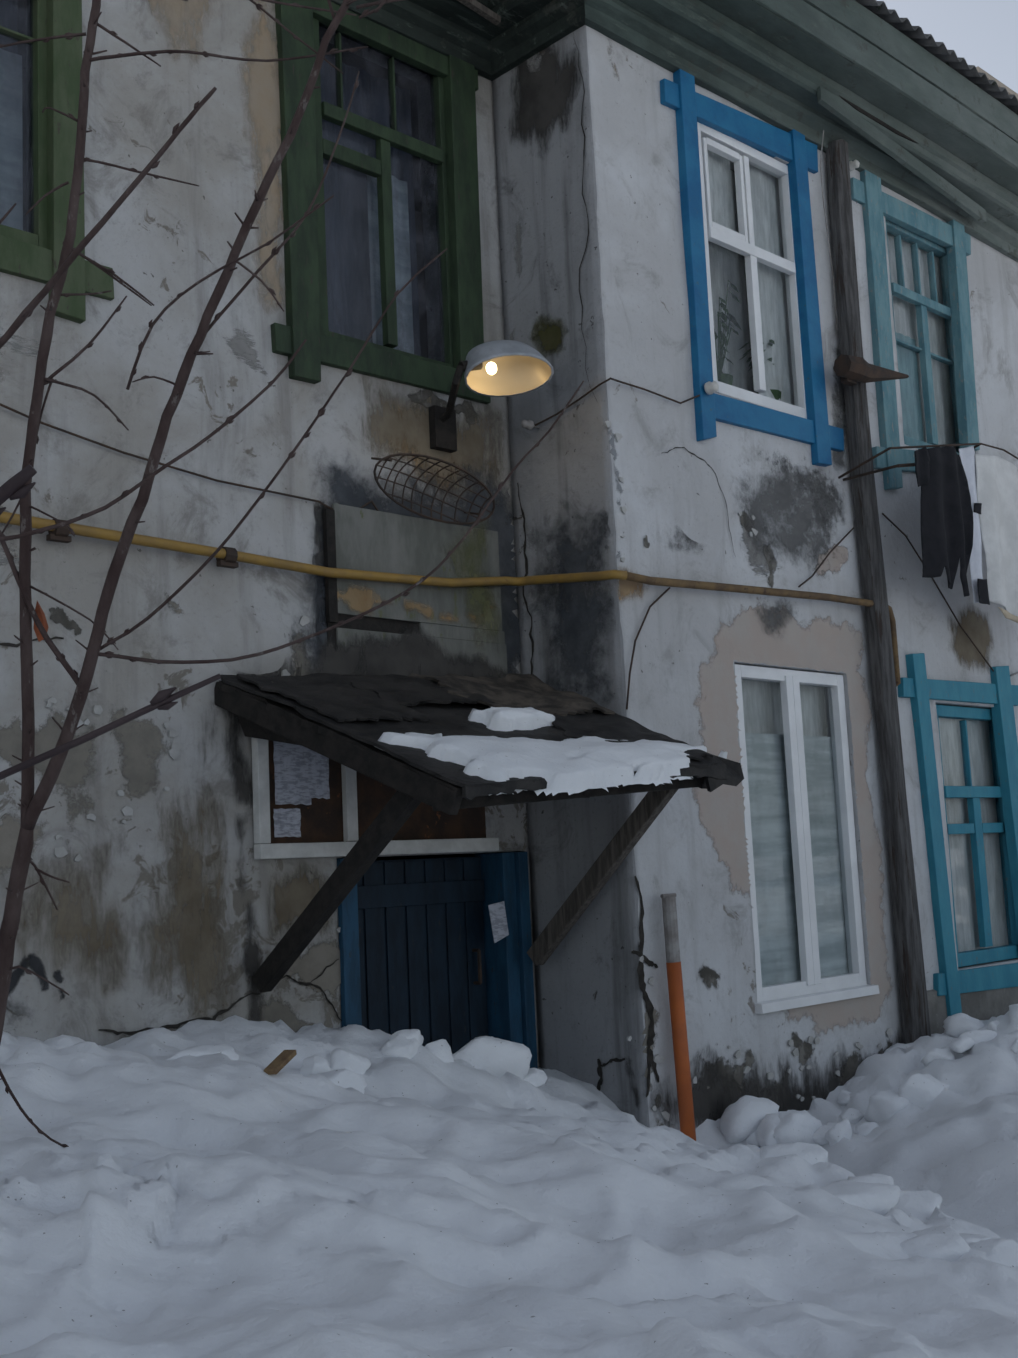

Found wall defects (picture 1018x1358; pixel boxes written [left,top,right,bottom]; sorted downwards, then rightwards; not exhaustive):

damp [511,45,580,148]
damp [536,513,613,700]
peeling [742,525,778,575]
peeling [815,544,848,575]
spalling [0,697,181,824]
damp [226,711,253,804]
spalling [0,815,82,874]
peeling [692,605,892,1034]
damp [147,798,225,1014]
damp [272,868,324,937]
damp [243,904,262,1021]
damp [656,1029,903,1127]